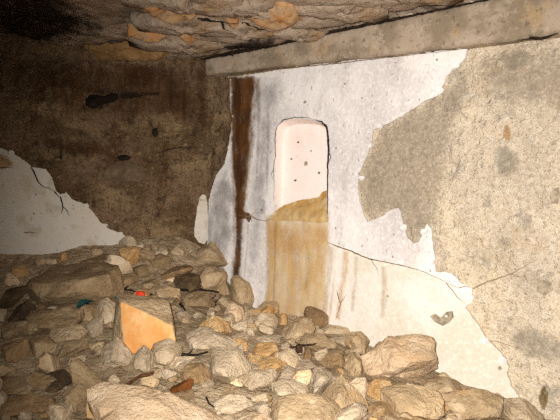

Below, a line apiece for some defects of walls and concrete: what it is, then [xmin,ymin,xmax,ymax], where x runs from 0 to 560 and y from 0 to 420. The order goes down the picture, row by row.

spalling [248,1,303,31]
crack [31,167,69,215]
spalling [0,24,234,255]
corrosion [230,76,259,275]
leakage [267,199,327,316]
crack [328,242,531,301]
spalling [358,38,560,420]